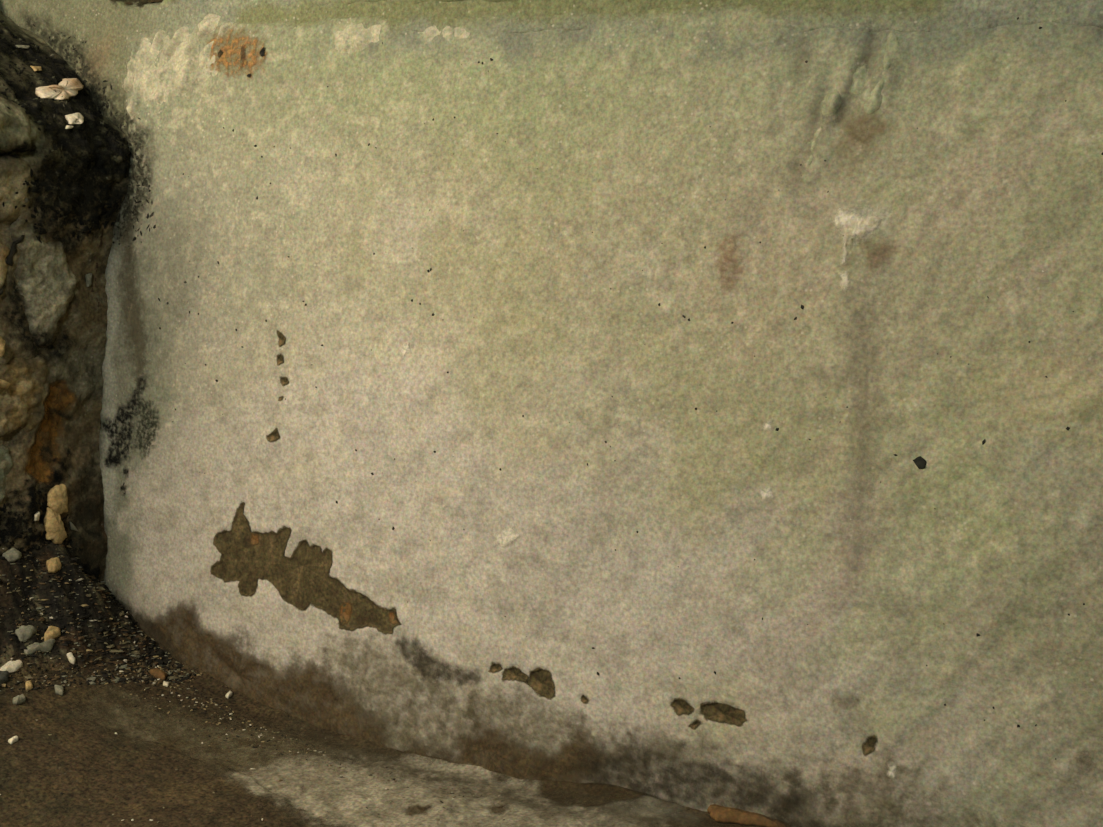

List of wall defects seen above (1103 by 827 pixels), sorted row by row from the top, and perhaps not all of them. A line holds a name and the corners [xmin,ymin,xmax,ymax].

spalling [209,29,266,77]
peeling [277,331,288,401]
peeling [266,428,280,442]
peeling [210,502,401,634]
peeling [488,662,555,699]
water stain [91,603,932,827]
peeling [670,698,747,729]